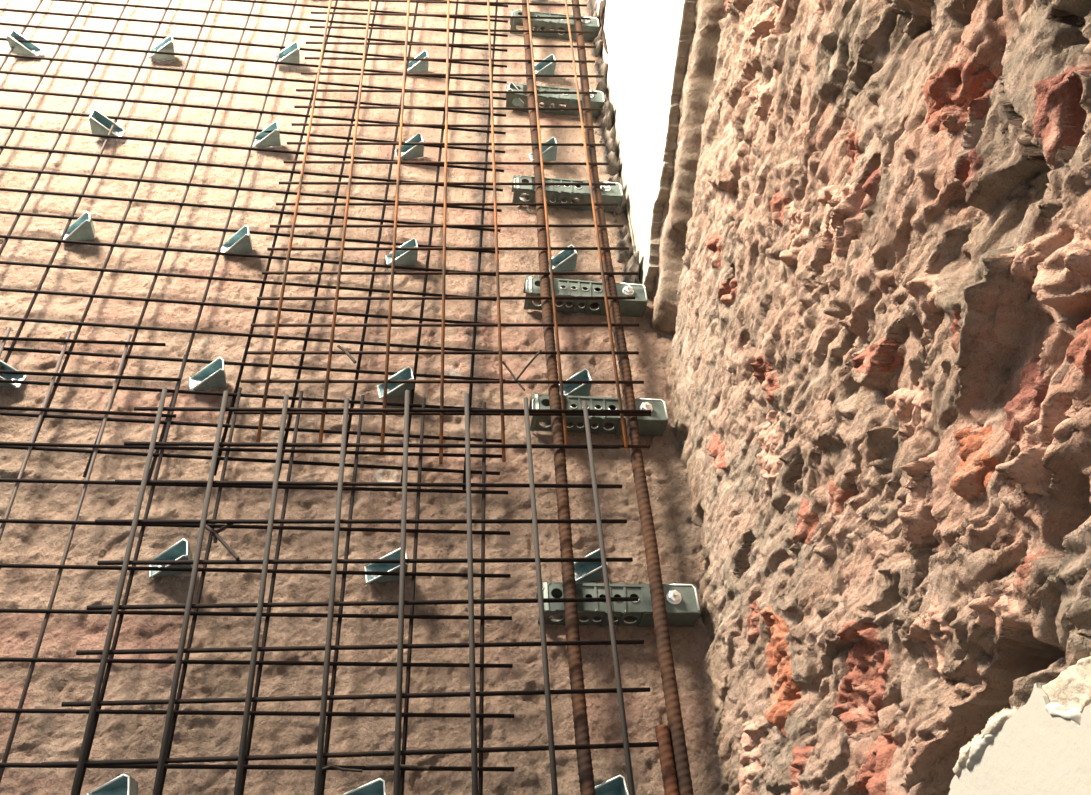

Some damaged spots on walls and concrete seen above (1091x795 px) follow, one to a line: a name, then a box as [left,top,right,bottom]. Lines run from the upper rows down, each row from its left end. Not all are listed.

spalling [587,0,1091,795]